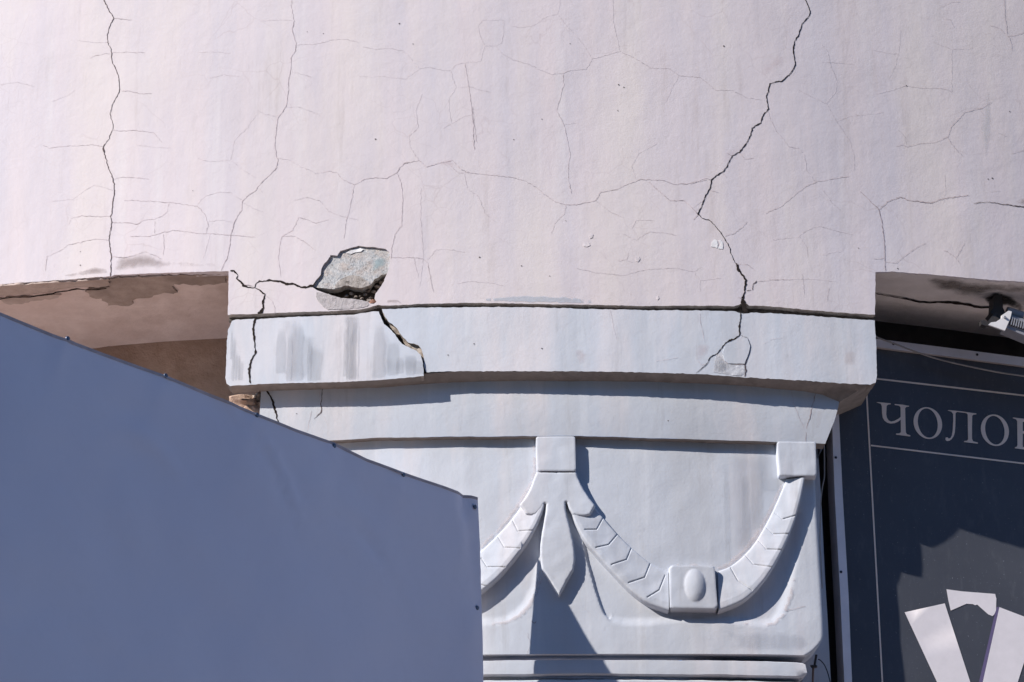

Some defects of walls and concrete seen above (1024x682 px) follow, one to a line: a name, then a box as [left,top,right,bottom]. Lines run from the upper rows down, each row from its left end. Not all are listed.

peeling [0,274,227,306]
spalling [225,247,425,414]
crack [0,0,1024,422]